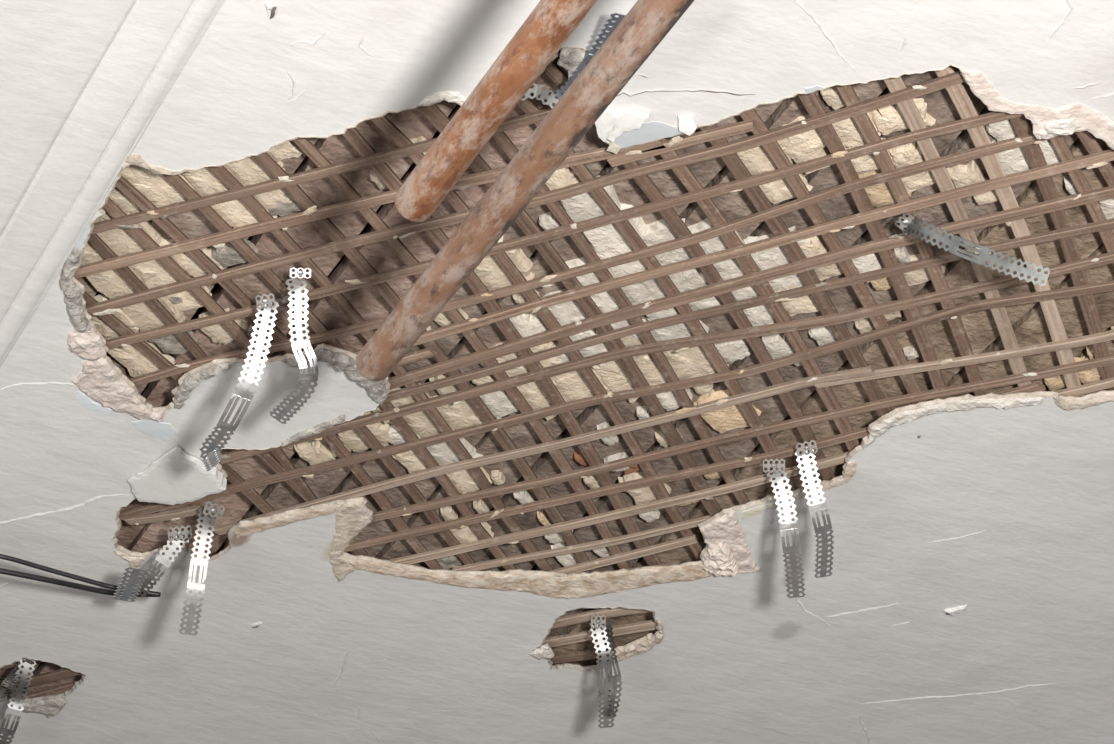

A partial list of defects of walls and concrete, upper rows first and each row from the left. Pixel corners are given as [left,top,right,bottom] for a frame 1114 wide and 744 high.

spalling [539,47,594,90]
crack [794,0,857,74]
spalling [595,64,1114,154]
spalling [59,92,1114,673]
spalling [0,659,86,718]